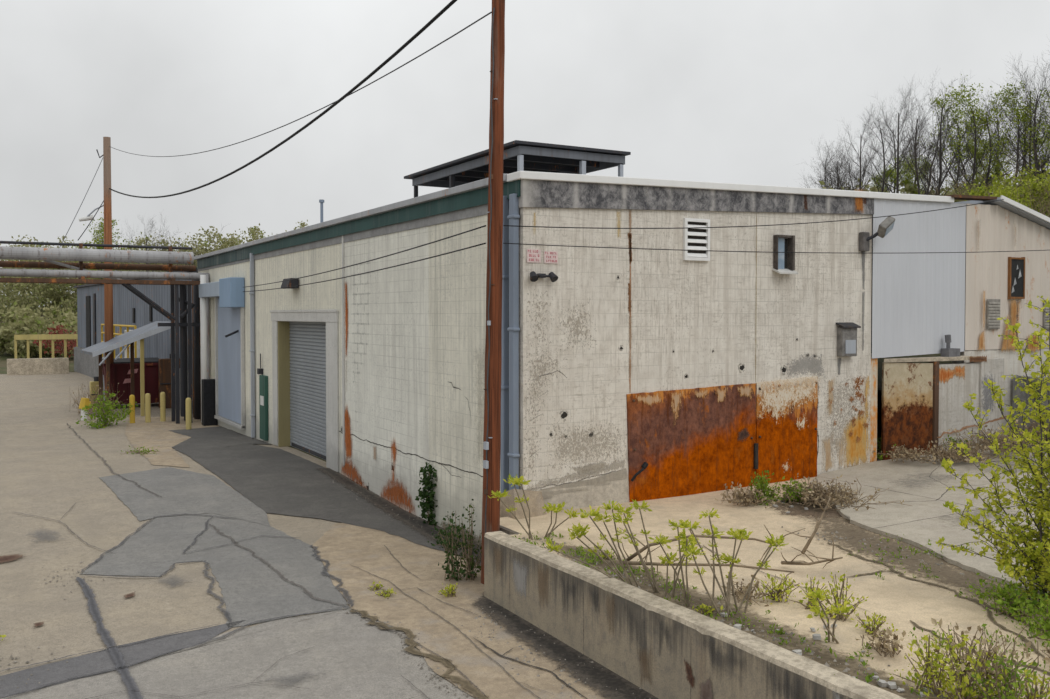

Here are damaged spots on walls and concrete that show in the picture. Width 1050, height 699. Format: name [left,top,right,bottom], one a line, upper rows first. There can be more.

rust [939,291,987,383]
rust [1002,299,1040,352]
rust [341,408,362,486]
rust [381,441,414,513]
crack [339,431,483,477]
peeling [636,365,867,465]
crack [76,577,143,699]